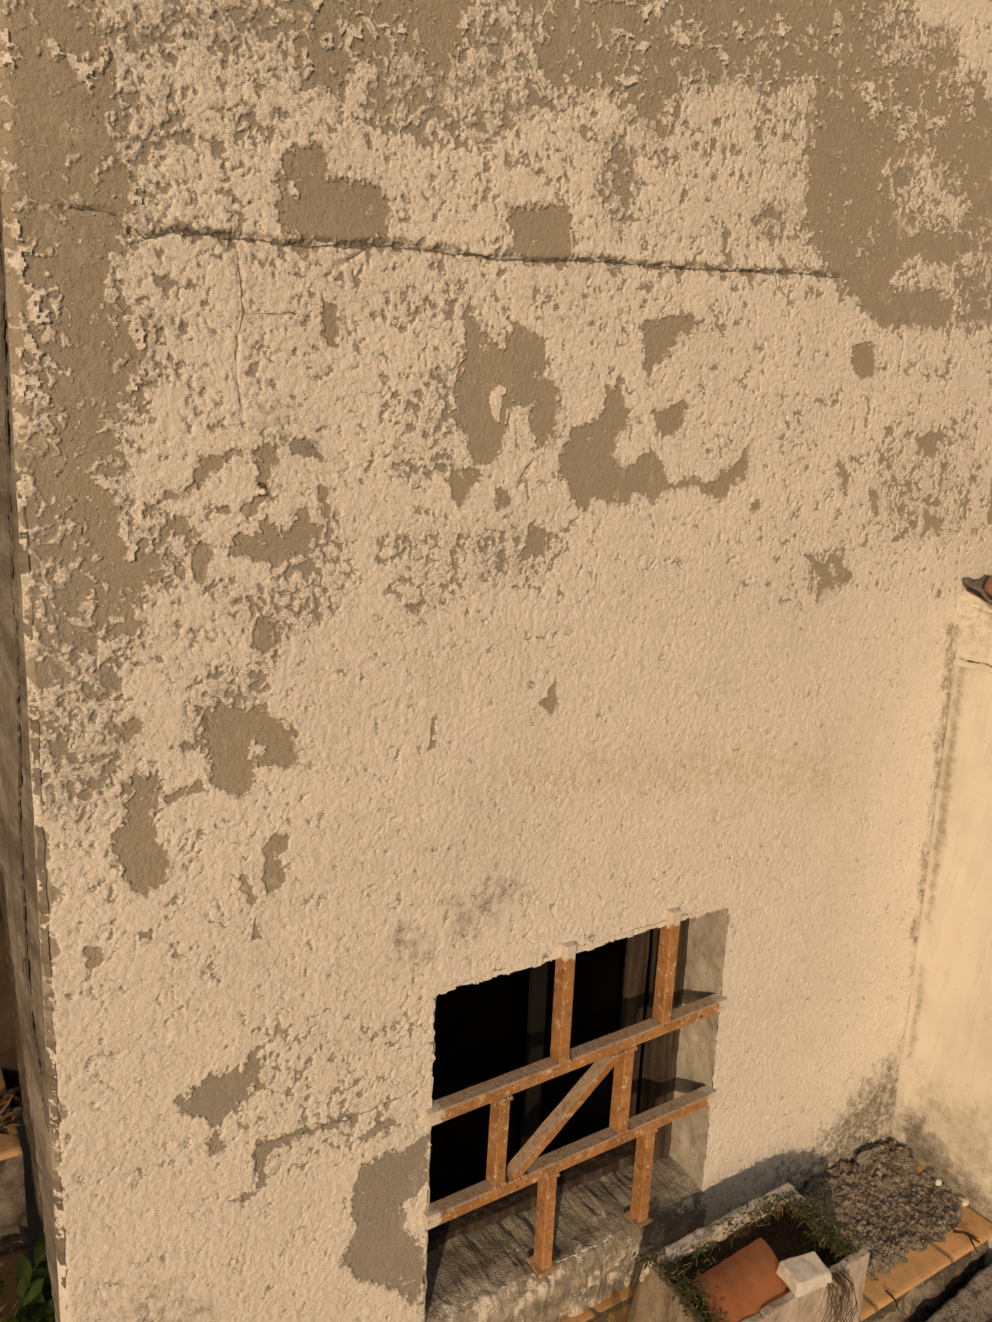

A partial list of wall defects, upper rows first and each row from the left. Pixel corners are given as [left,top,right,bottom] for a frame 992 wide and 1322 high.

peeling [295,0,474,91]
peeling [276,143,389,250]
peeling [536,0,992,269]
peeling [0,0,323,648]
crack [72,204,838,419]
peeling [446,310,748,511]
peeling [851,343,875,379]
peeling [110,699,299,904]
peeling [174,1050,263,1155]
peeling [236,1113,395,1203]
peeling [340,1135,428,1305]
leakage [763,1062,992,1219]